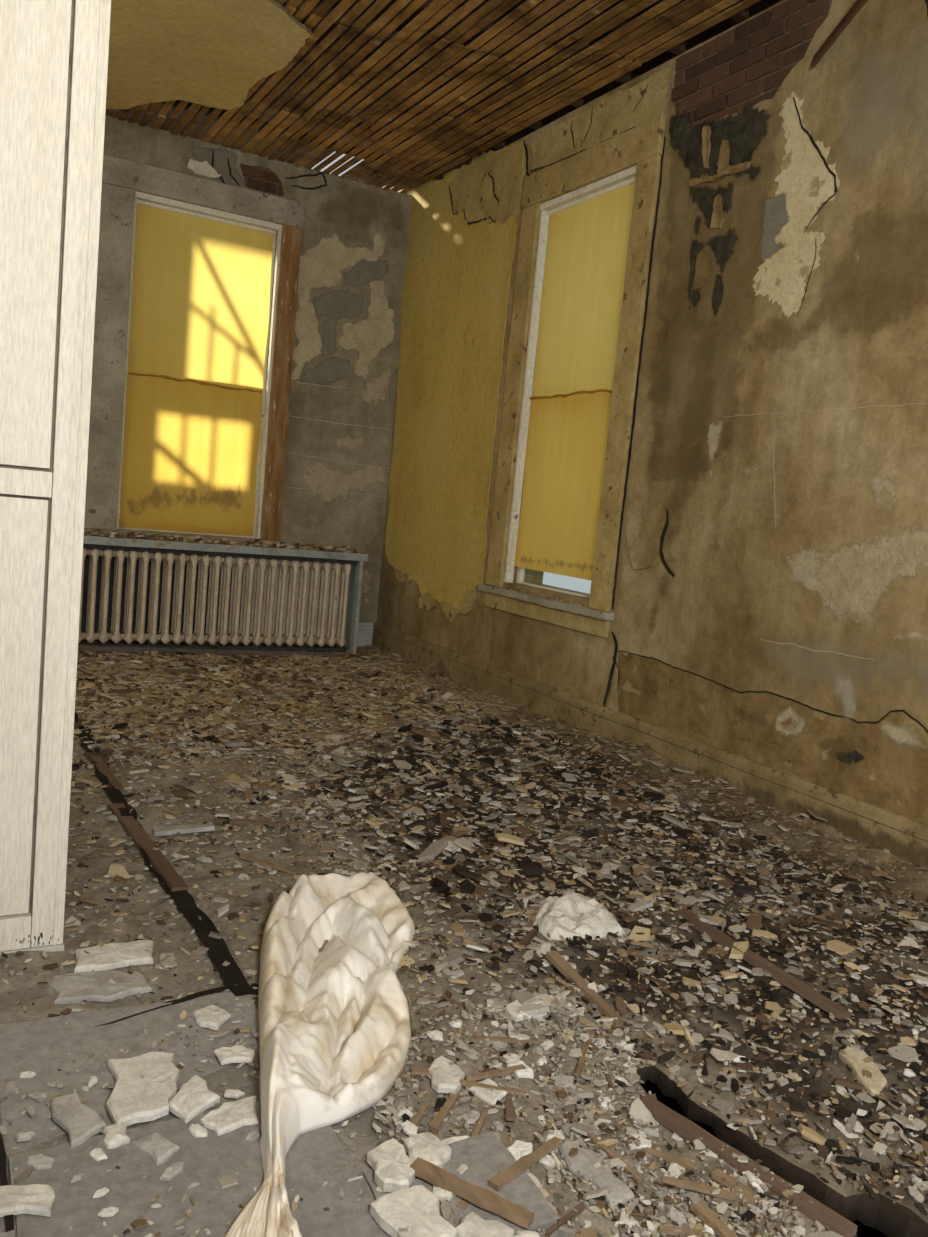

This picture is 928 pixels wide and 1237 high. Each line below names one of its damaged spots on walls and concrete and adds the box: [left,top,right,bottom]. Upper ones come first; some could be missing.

flaking render [188,147,327,196]
flaking render [668,0,840,324]
peeling [291,141,526,623]
crack [523,67,676,707]
peeling [708,421,723,478]
crack [723,381,928,528]
peeling [788,524,928,627]
crack [760,639,874,660]